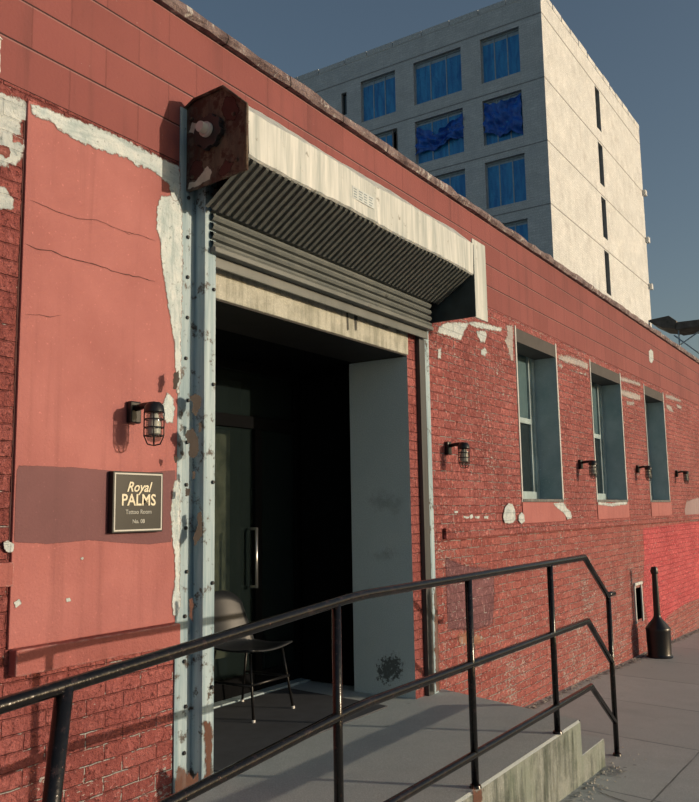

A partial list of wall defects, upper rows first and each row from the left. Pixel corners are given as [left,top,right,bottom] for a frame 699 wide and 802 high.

corrosion [189,160,203,180]
peeling [0,92,212,424]
crack [8,120,155,558]
peeling [437,321,513,360]
corrosion [185,394,202,458]
peeling [170,478,181,616]
corrosion [193,512,203,546]
peeling [503,503,525,524]
peeling [554,502,572,519]
damp [376,654,403,686]
corrosion [175,721,213,792]